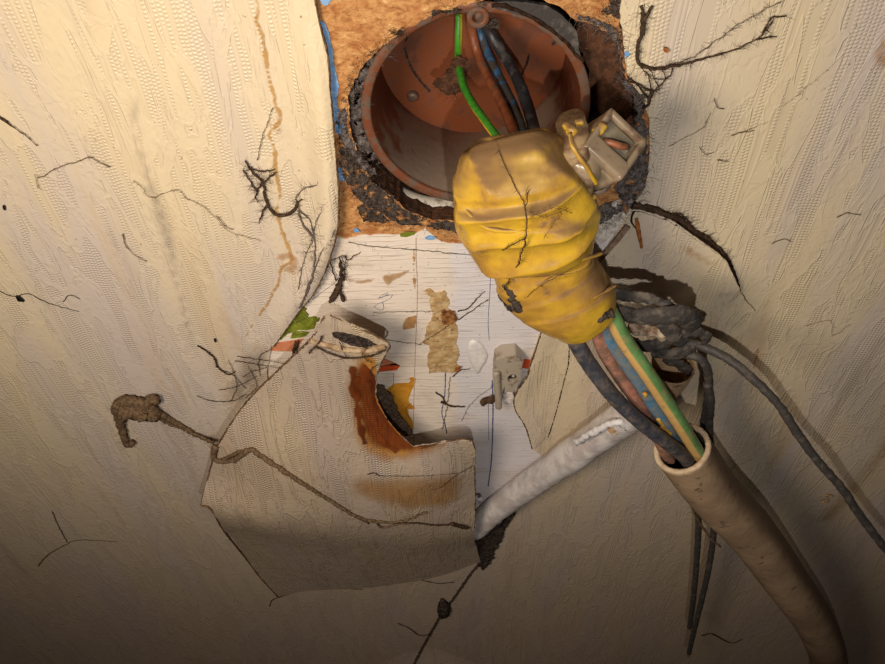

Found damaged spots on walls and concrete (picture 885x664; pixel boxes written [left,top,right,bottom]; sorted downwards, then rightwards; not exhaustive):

leakage [255,14,293,316]
peeling [320,20,344,134]
spalling [587,103,601,124]
peeling [422,288,461,374]
peeling [200,312,481,598]
rust [349,354,446,457]
crack [397,560,482,664]